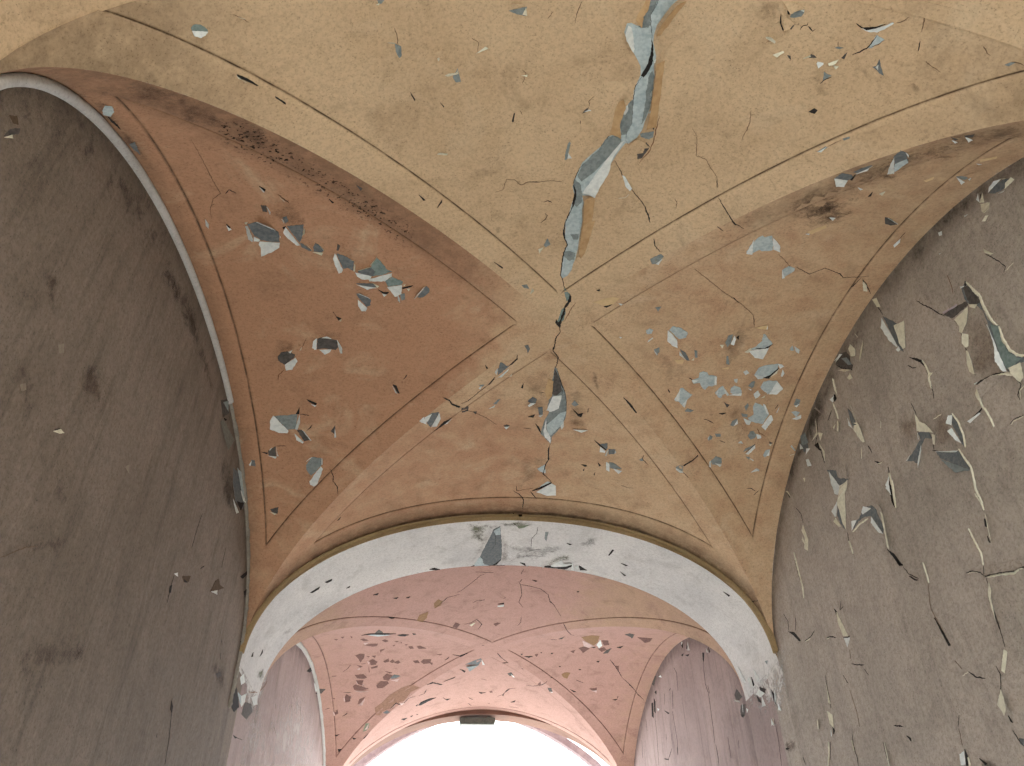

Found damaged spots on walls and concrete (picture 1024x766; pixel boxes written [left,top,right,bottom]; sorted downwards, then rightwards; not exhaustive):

damp [221,125,409,243]
peeling [245,205,430,312]
peeling [270,399,317,444]
peeling [278,337,342,379]
crack [498,0,692,635]
peeling [668,320,784,472]
peeling [863,281,934,398]
spalling [471,526,505,567]
peeling [790,334,950,646]
peeling [906,275,1024,746]
peeling [307,630,485,739]
peeling [571,633,652,663]